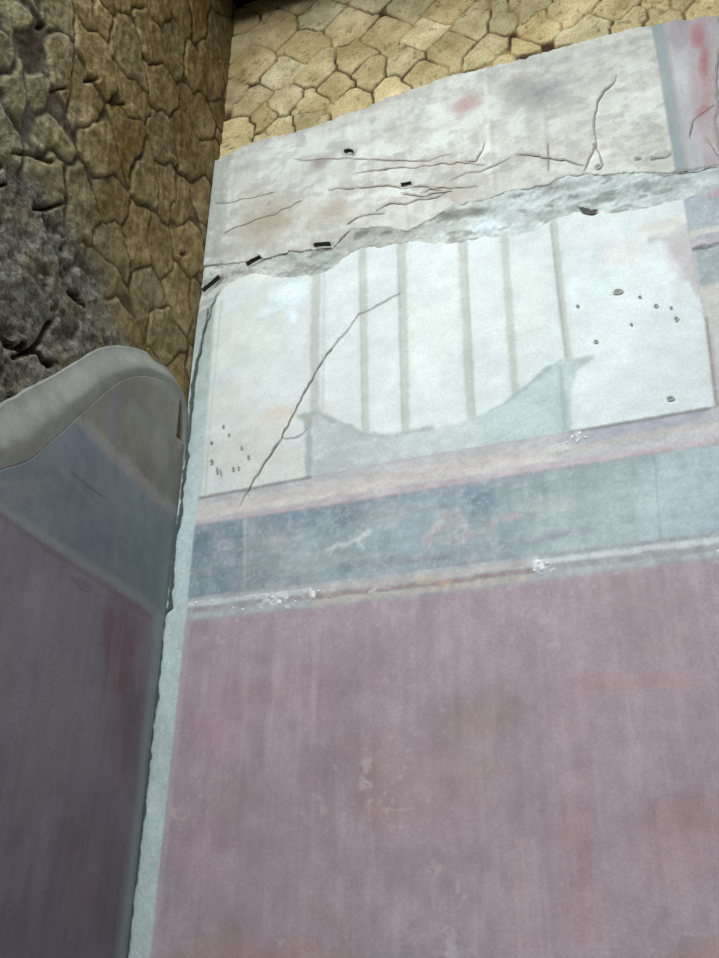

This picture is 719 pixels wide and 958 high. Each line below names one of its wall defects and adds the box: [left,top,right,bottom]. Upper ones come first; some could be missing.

crack [215,192,302,234]
crack [294,74,617,224]
flaking render [198,164,719,314]
crack [651,49,719,174]
crack [240,293,400,505]